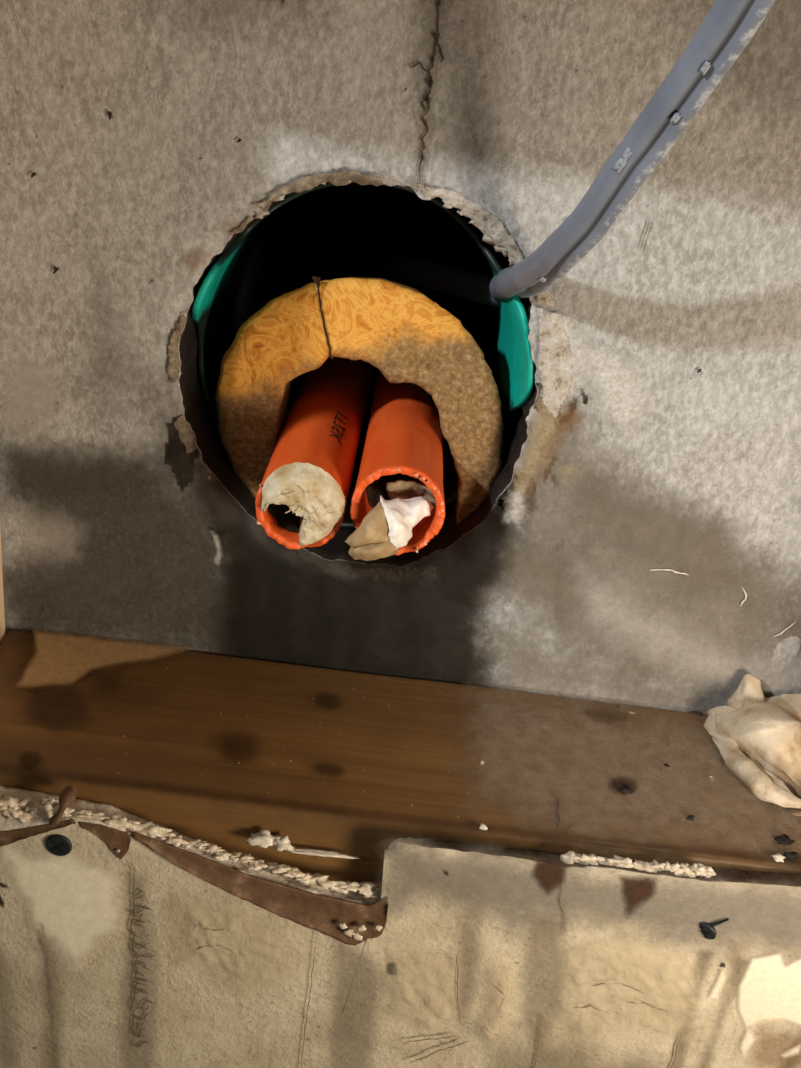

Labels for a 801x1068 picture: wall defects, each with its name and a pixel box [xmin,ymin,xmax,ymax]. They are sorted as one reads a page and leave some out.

crack [409,0,445,192]
spalling [243,830,360,859]
leakage [393,852,801,948]